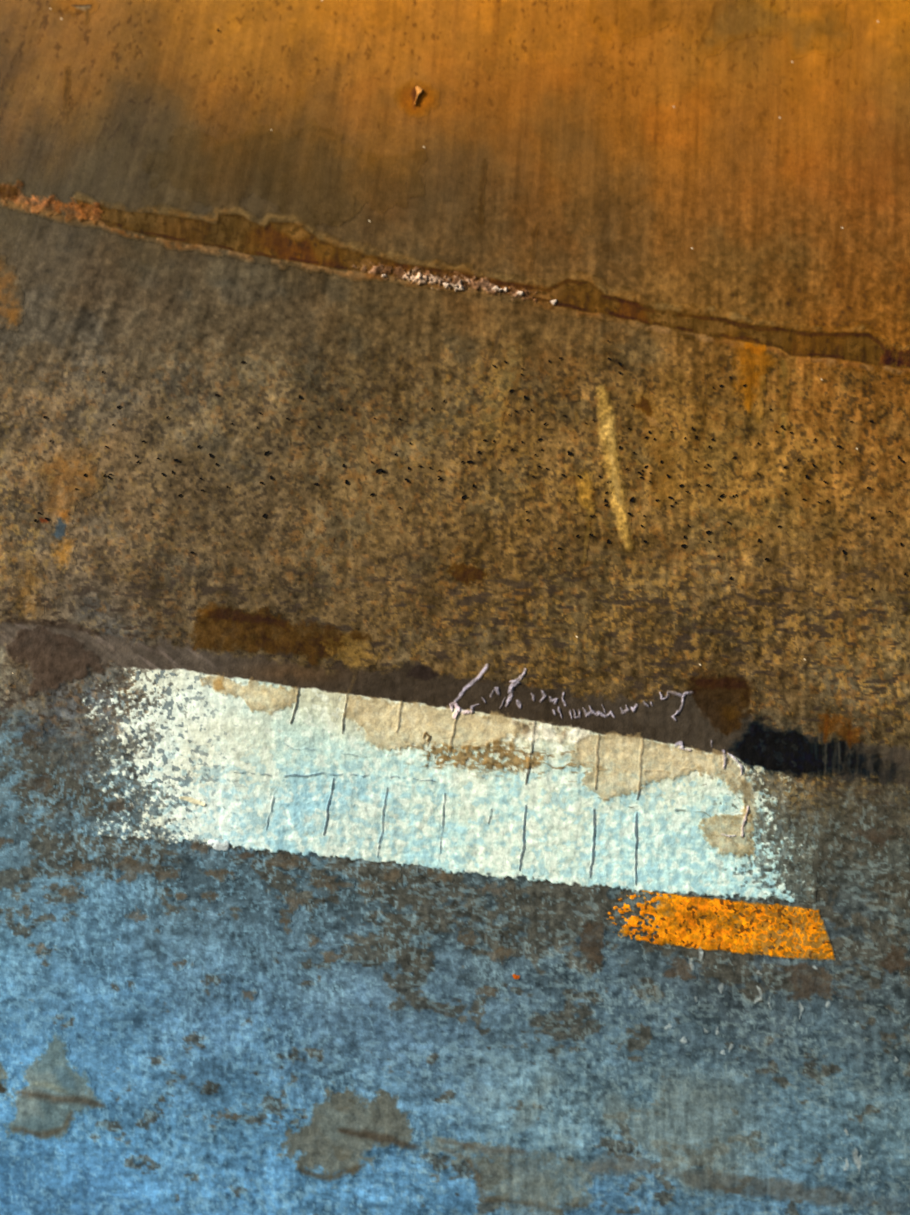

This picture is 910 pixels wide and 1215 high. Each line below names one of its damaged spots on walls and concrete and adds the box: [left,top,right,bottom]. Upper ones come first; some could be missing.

crack [0,178,910,377]
peeling [105,796,134,816]
peeling [0,1029,111,1142]
peeling [274,1082,596,1215]